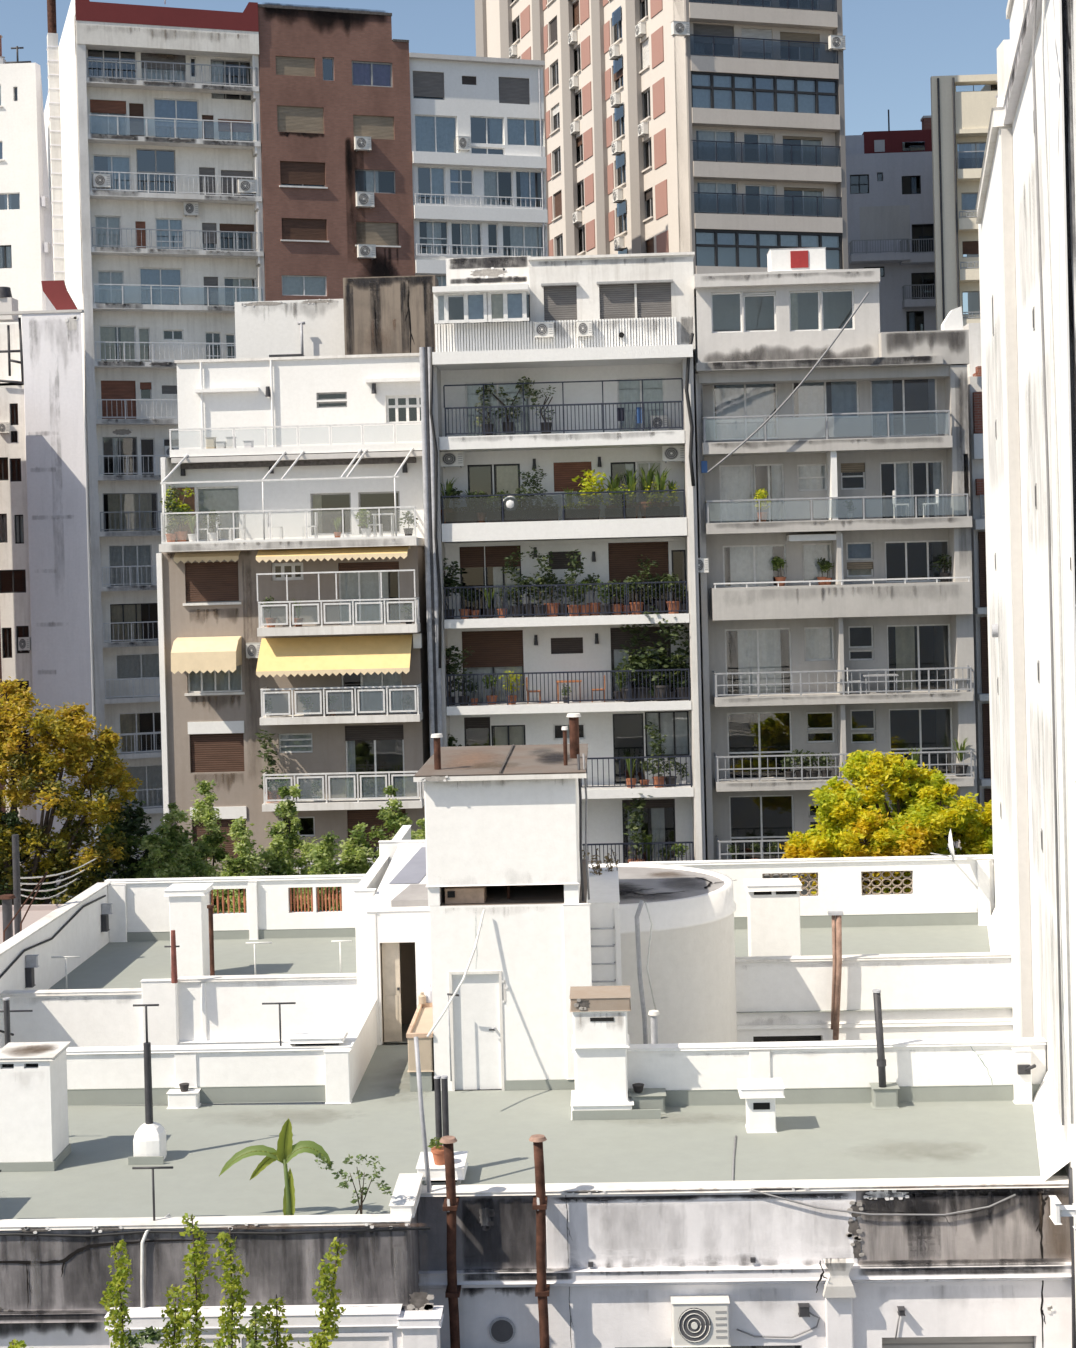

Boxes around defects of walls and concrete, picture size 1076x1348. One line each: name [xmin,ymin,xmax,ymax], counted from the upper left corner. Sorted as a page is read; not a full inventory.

water stain [346,249,434,353]
water stain [707,332,964,369]
water stain [463,1199,570,1293]
water stain [862,1188,1067,1275]